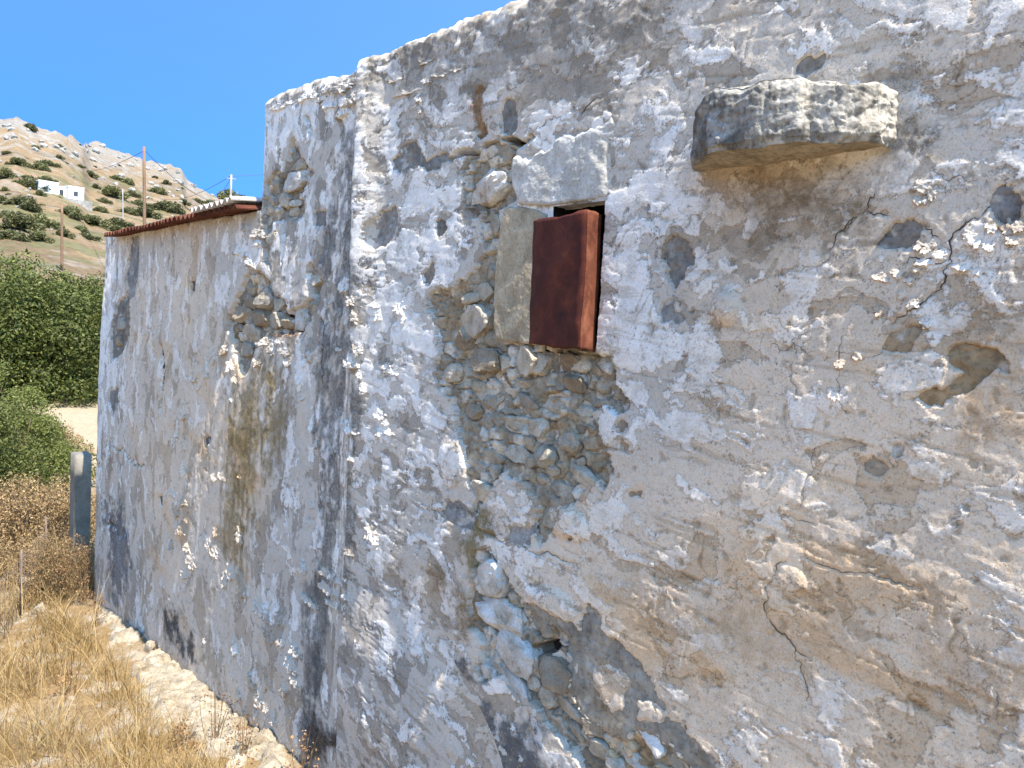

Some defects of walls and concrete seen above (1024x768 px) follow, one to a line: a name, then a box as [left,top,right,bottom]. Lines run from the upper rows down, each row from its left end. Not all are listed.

damp [223,372,286,564]
flaking render [189,143,406,403]
flaking render [424,87,630,546]
crack [817,182,888,272]
crack [892,206,990,324]
flaking render [918,343,1011,407]
flaking render [472,550,716,768]
crack [721,548,914,699]